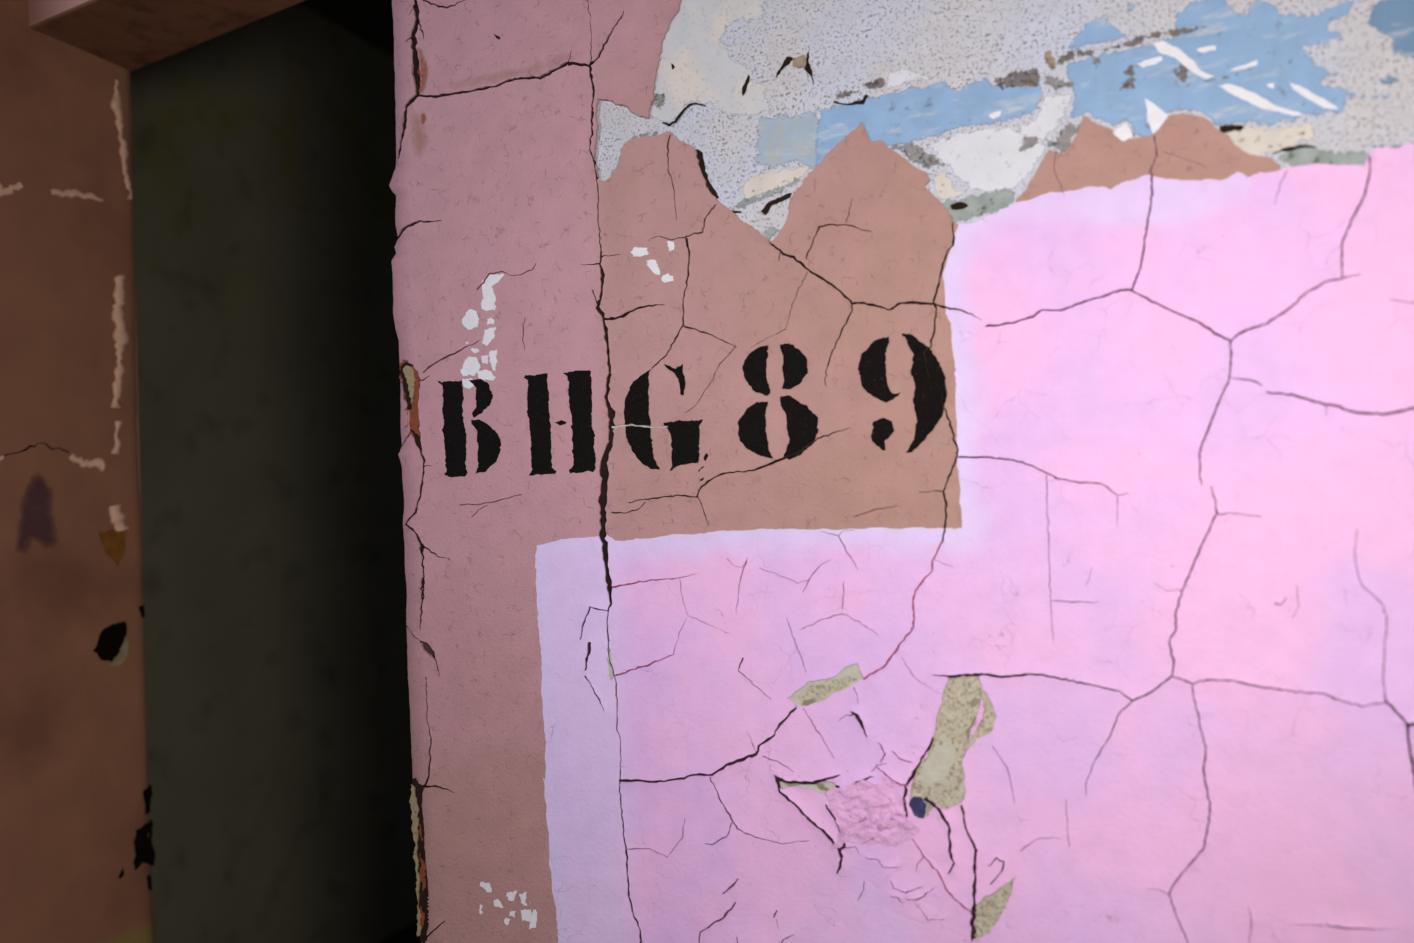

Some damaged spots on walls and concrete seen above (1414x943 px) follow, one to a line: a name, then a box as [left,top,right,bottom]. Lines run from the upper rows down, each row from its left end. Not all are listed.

peeling [595,0,1414,244]
crack [4,443,70,457]
crack [398,0,1414,943]
spalling [93,605,145,668]
peeling [788,663,863,706]
spalling [908,676,996,862]
spalling [973,877,1016,941]